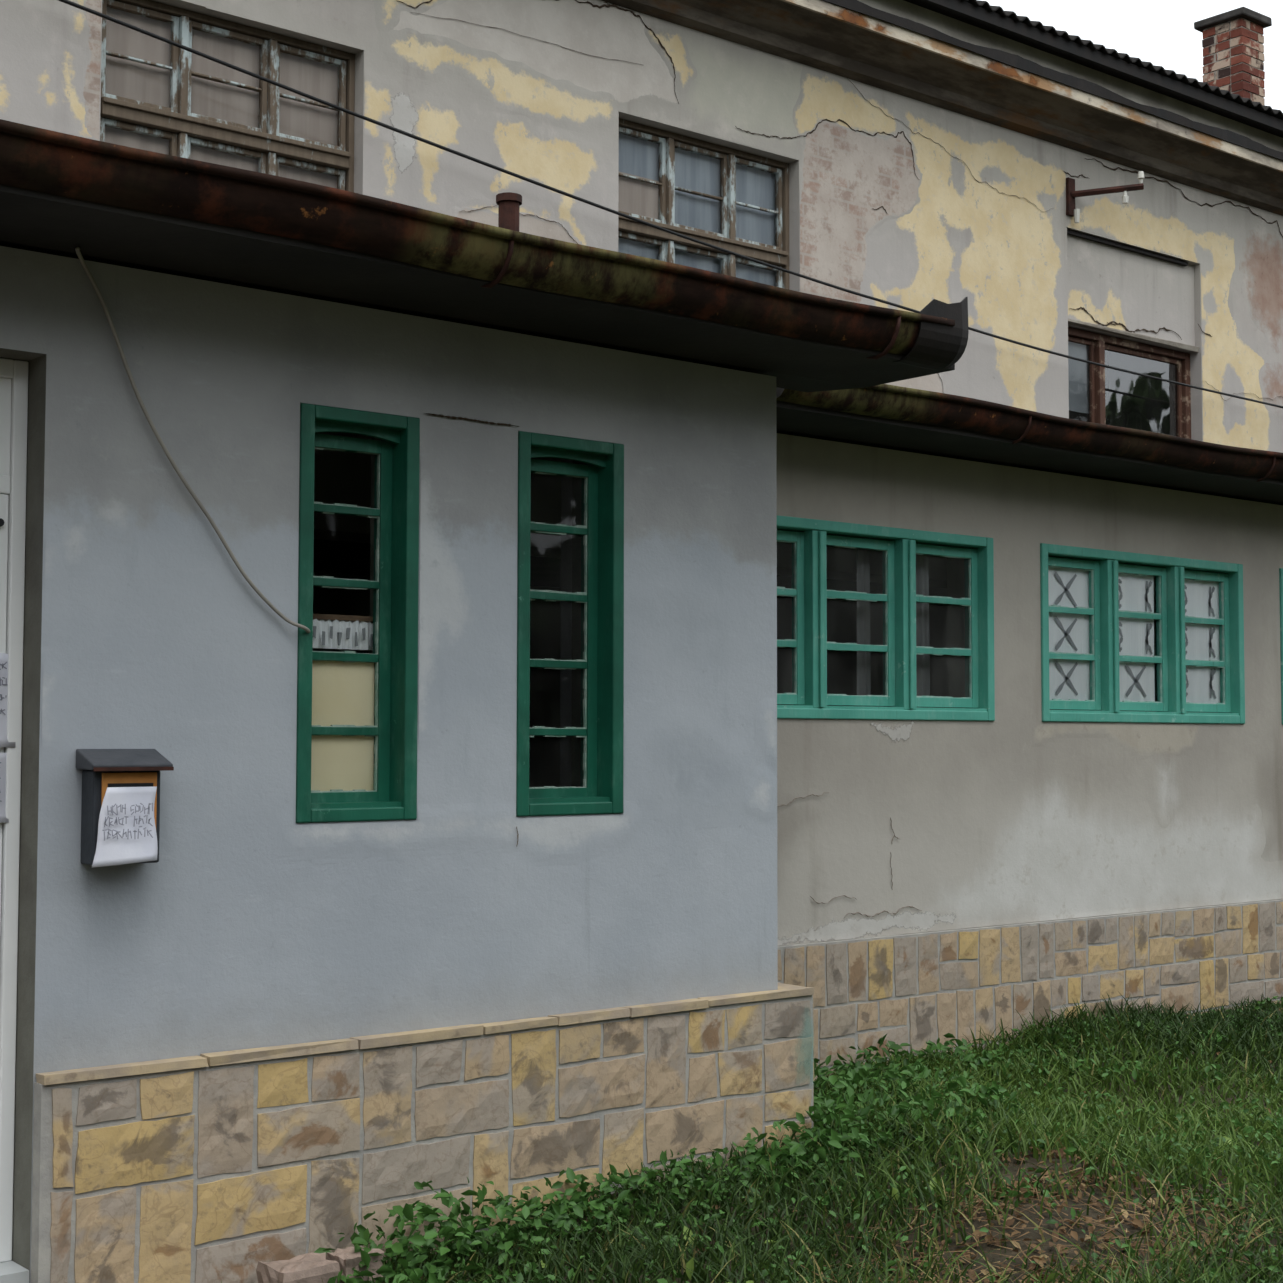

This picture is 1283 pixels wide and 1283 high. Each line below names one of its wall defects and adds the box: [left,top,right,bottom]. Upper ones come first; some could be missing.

peeling [0,0,101,141]
crack [396,0,679,104]
rust [839,9,885,31]
rust [987,62,1037,85]
flaking render [202,0,697,248]
crack [735,78,1050,211]
crack [1064,158,1283,237]
peeling [793,66,1283,452]
crack [1070,307,1212,340]
crack [810,818,922,918]
flaking render [778,911,956,946]